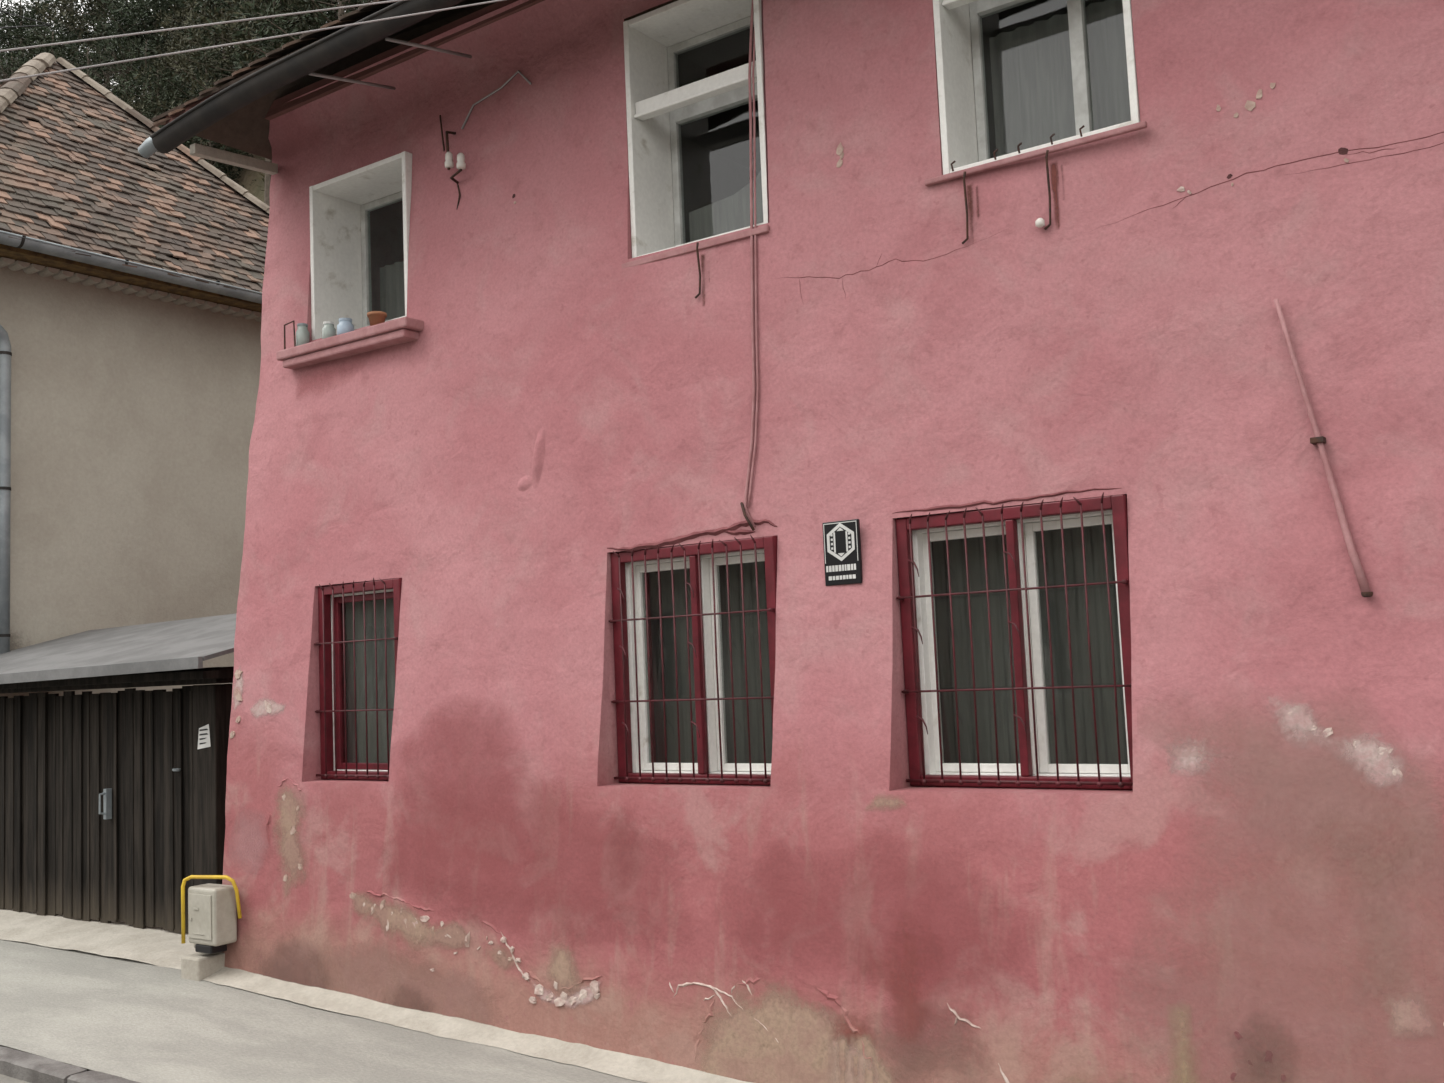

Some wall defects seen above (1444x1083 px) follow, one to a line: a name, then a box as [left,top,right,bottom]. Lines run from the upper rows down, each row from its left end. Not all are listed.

flaking render [230,670,243,739]
flaking render [266,778,304,885]
peeling [349,891,602,1007]
flaking render [694,977,891,1083]
flaking render [1393,999,1444,1034]